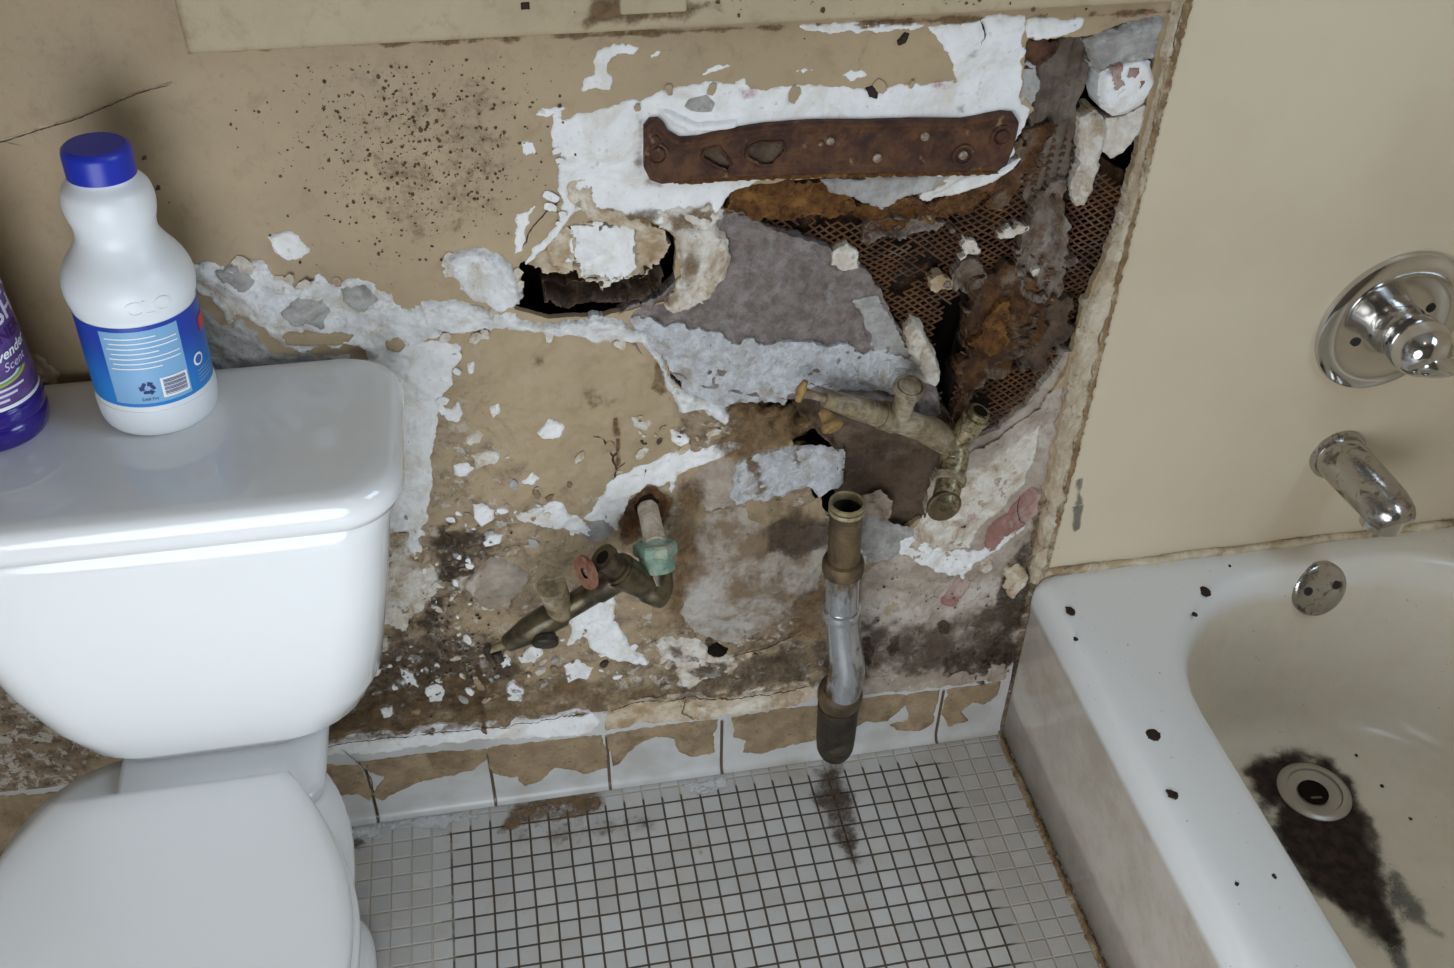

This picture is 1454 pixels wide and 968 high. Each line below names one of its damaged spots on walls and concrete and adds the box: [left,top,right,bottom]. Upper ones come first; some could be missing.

mould [265,57,576,267]
rust [723,117,1056,231]
flaking render [1066,16,1163,206]
peeling [193,13,1072,731]
rust [946,254,1057,427]
damp [328,523,658,743]
peeling [326,597,818,801]
damp [671,588,829,696]
damp [767,513,829,560]
damp [862,524,1037,686]
damp [502,792,601,830]
damp [813,766,857,863]